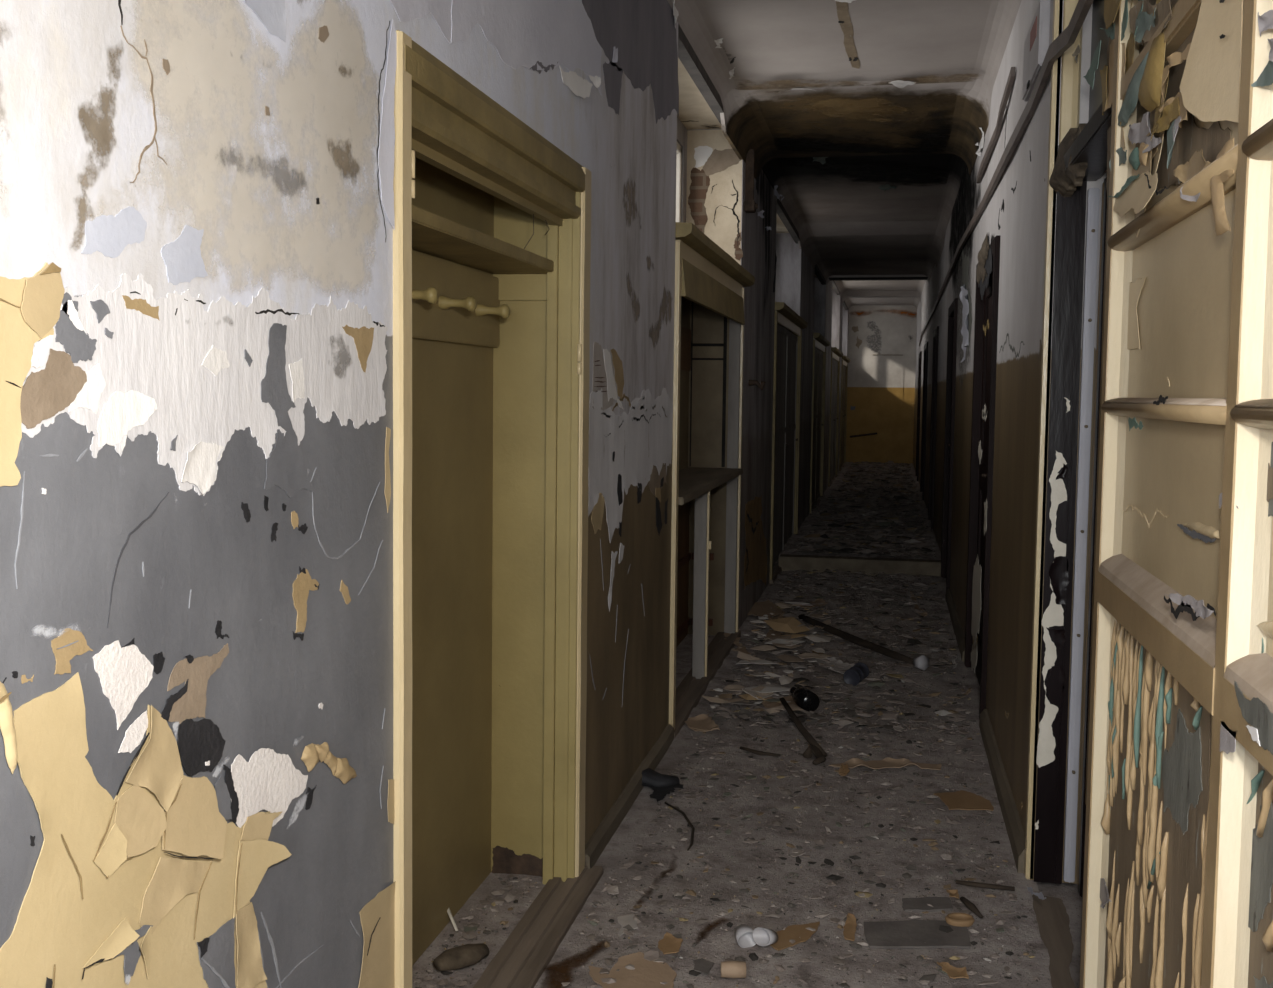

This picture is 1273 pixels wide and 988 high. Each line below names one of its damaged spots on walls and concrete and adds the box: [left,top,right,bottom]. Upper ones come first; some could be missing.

leakage [73,48,122,247]
crack [118,0,168,183]
leakage [221,151,305,193]
peeling [0,0,679,542]
leakage [328,142,359,178]
leakage [737,74,978,154]
peeling [1072,0,1273,236]
peeling [588,348,673,612]
peeling [1036,451,1070,768]
peeling [0,620,357,988]
peeling [1100,620,1273,988]
peeling [358,881,396,988]